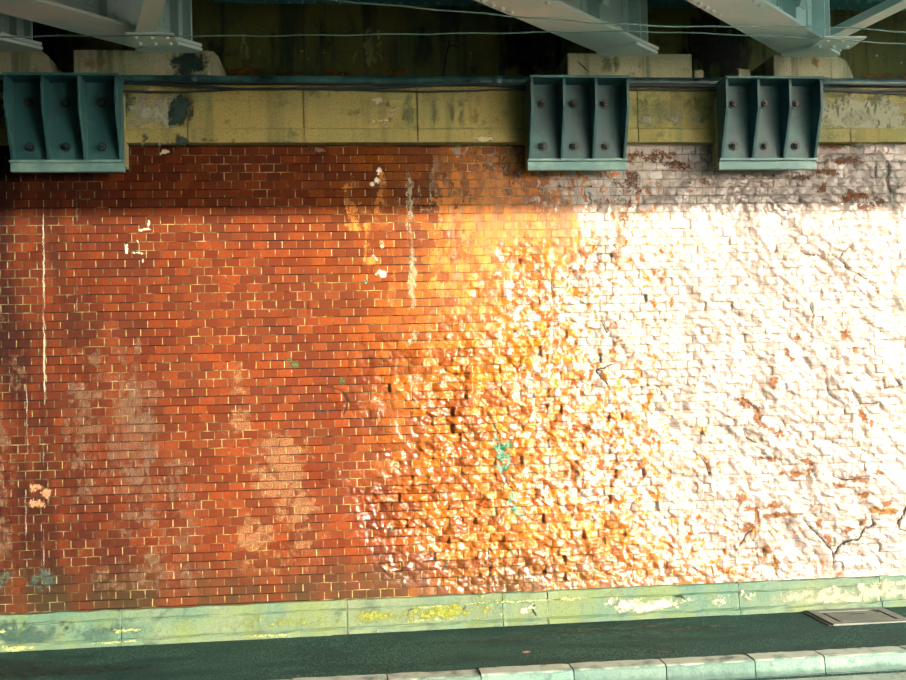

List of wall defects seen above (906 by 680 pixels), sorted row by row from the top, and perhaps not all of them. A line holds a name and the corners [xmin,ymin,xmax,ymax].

spalling [614,149,691,221]
spalling [579,241,620,275]
leakage [229,410,250,430]
leakage [238,430,320,551]
crack [803,516,875,566]
leakage [31,569,56,588]